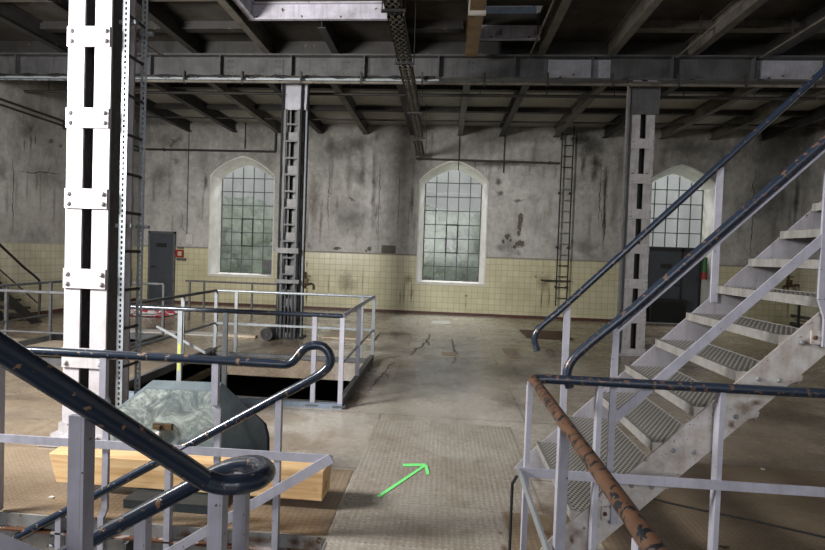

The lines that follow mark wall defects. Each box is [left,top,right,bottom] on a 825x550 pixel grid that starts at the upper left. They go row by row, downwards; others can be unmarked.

crack [369,335,430,390]